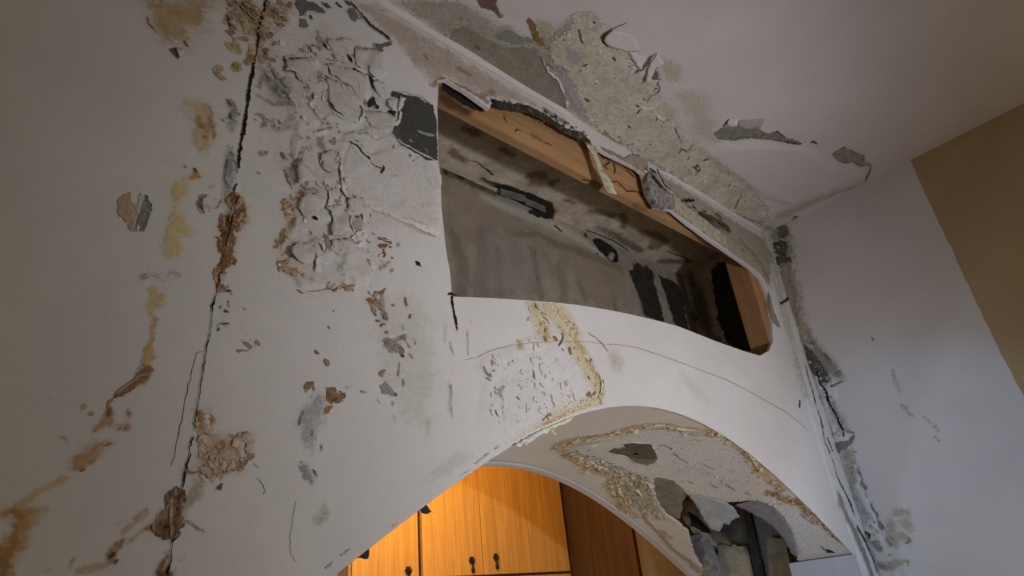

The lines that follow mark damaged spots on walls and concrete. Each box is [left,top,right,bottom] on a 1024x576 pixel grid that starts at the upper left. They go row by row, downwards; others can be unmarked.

flaking render [118,192,152,232]
crack [171,0,267,489]
flaking render [282,0,775,353]
flaking render [715,119,817,145]
flaking render [832,147,871,181]
flaking render [150,486,187,541]
peeling [569,424,843,562]
flaking render [848,472,894,547]
leakage [842,449,912,571]
crack [166,534,176,576]